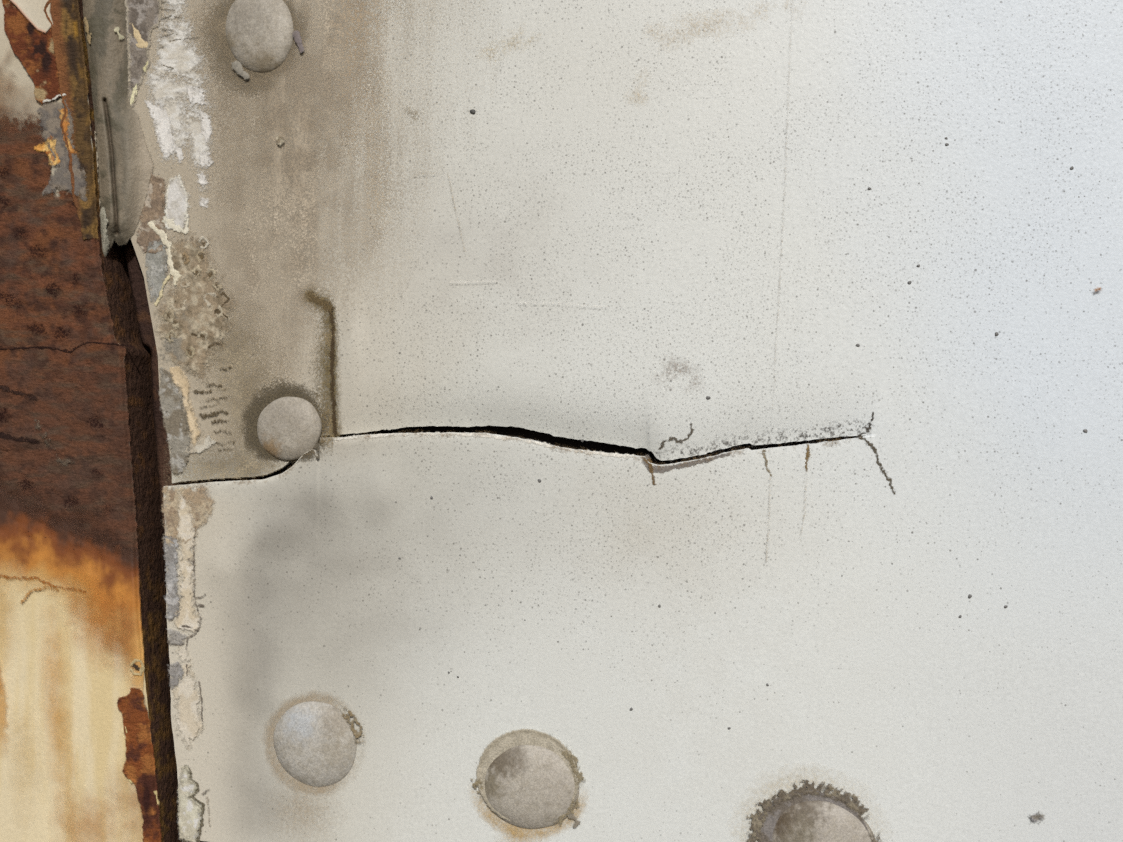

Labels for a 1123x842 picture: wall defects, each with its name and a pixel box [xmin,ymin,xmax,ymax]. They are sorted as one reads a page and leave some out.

corrosion [0,96,162,842]
peeling [114,0,235,749]
crack [260,460,297,480]
crack [305,290,896,494]
peeling [177,765,210,842]